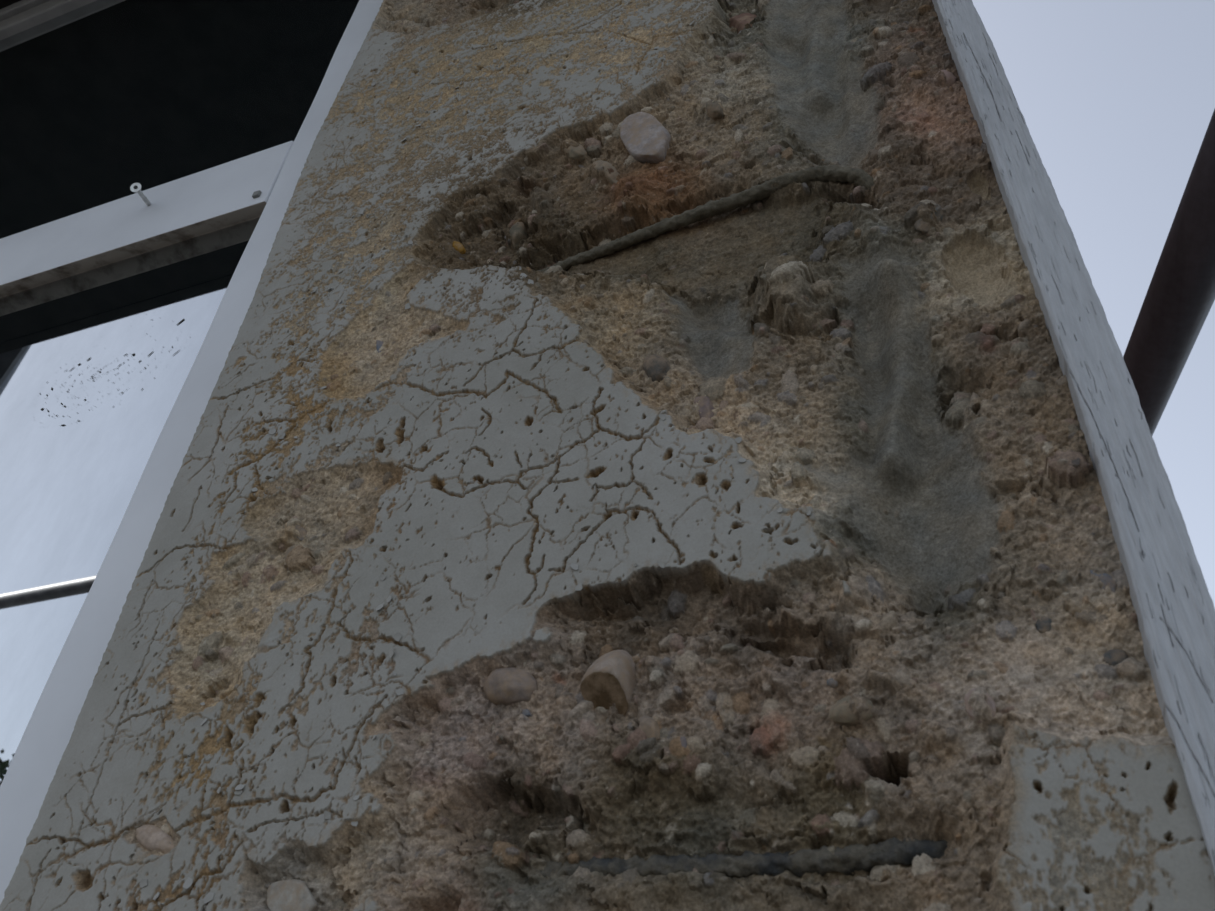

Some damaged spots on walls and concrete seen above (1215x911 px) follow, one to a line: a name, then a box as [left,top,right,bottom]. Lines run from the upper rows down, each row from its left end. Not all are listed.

peeling [391,416,417,447]
crack [373,266,683,605]
peeling [421,453,489,505]
peeling [583,443,607,489]
peeling [681,468,708,488]
peeling [712,500,744,542]
crack [26,357,330,911]
crack [279,549,426,715]
crack [152,694,389,911]
peeling [1033,762,1051,799]
peeling [1164,782,1177,814]
peeling [64,860,121,907]